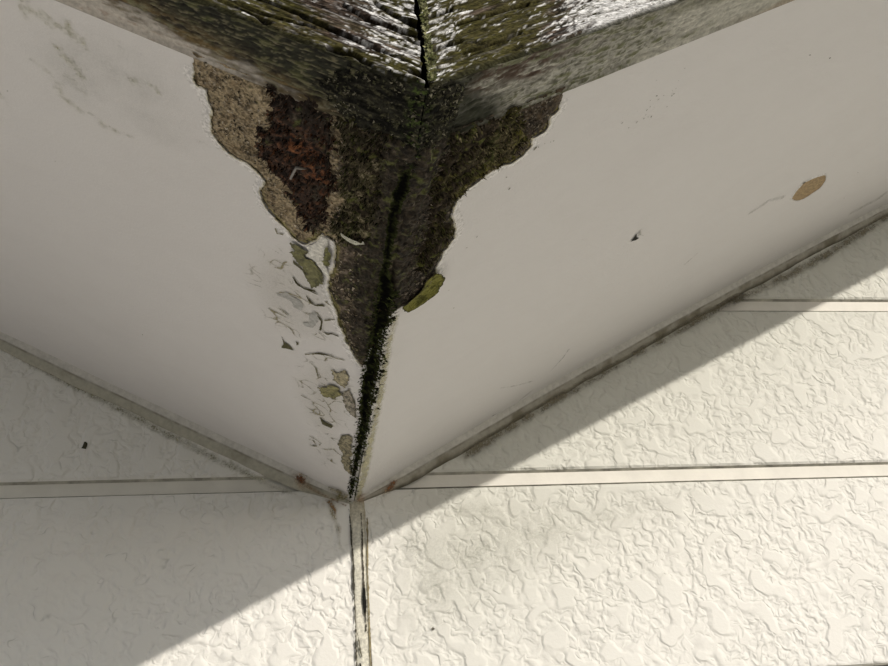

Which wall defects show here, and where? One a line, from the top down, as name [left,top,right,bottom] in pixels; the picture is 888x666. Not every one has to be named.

peeling [182,52,569,475]
peeling [790,173,828,202]
leakage [356,317,397,501]